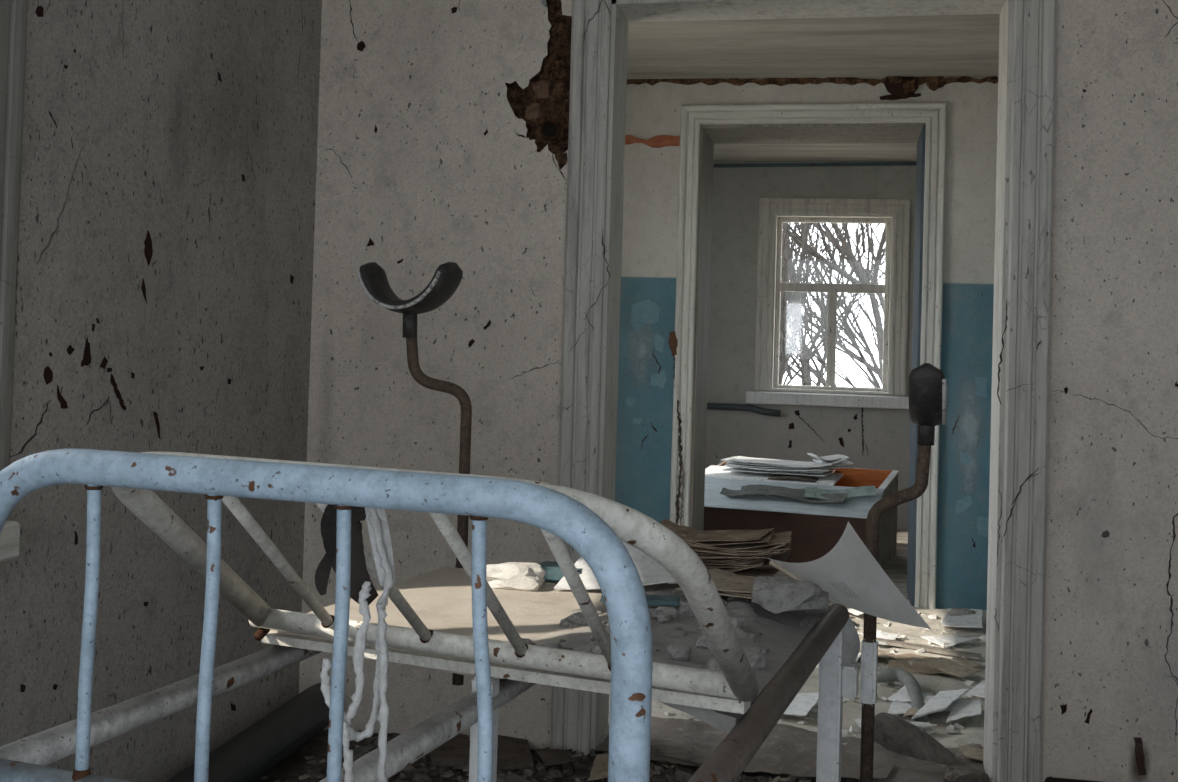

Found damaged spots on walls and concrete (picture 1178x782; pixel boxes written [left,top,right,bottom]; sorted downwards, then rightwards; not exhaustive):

crack [1162,0,1178,44]
spalling [507,0,572,182]
spalling [880,76,945,100]
spalling [625,135,680,148]
crack [997,300,1178,439]
crack [996,468,1039,567]
crack [1164,513,1178,742]